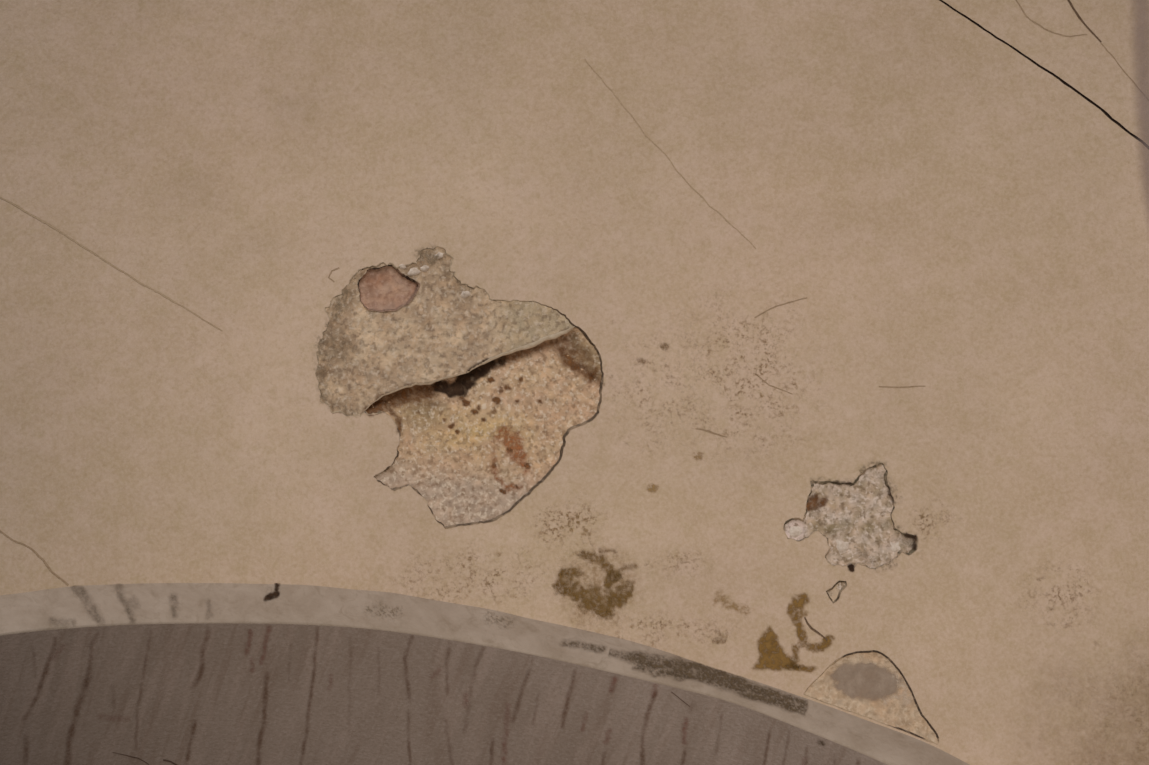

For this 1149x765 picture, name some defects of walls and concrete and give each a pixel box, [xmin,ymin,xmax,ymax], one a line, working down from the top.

crack [939,0,1149,149]
flaking render [315,246,604,528]
flaking render [783,463,919,603]
damp [554,550,636,619]
damp [564,642,807,712]
damp [754,593,833,672]
peeling [804,650,939,745]